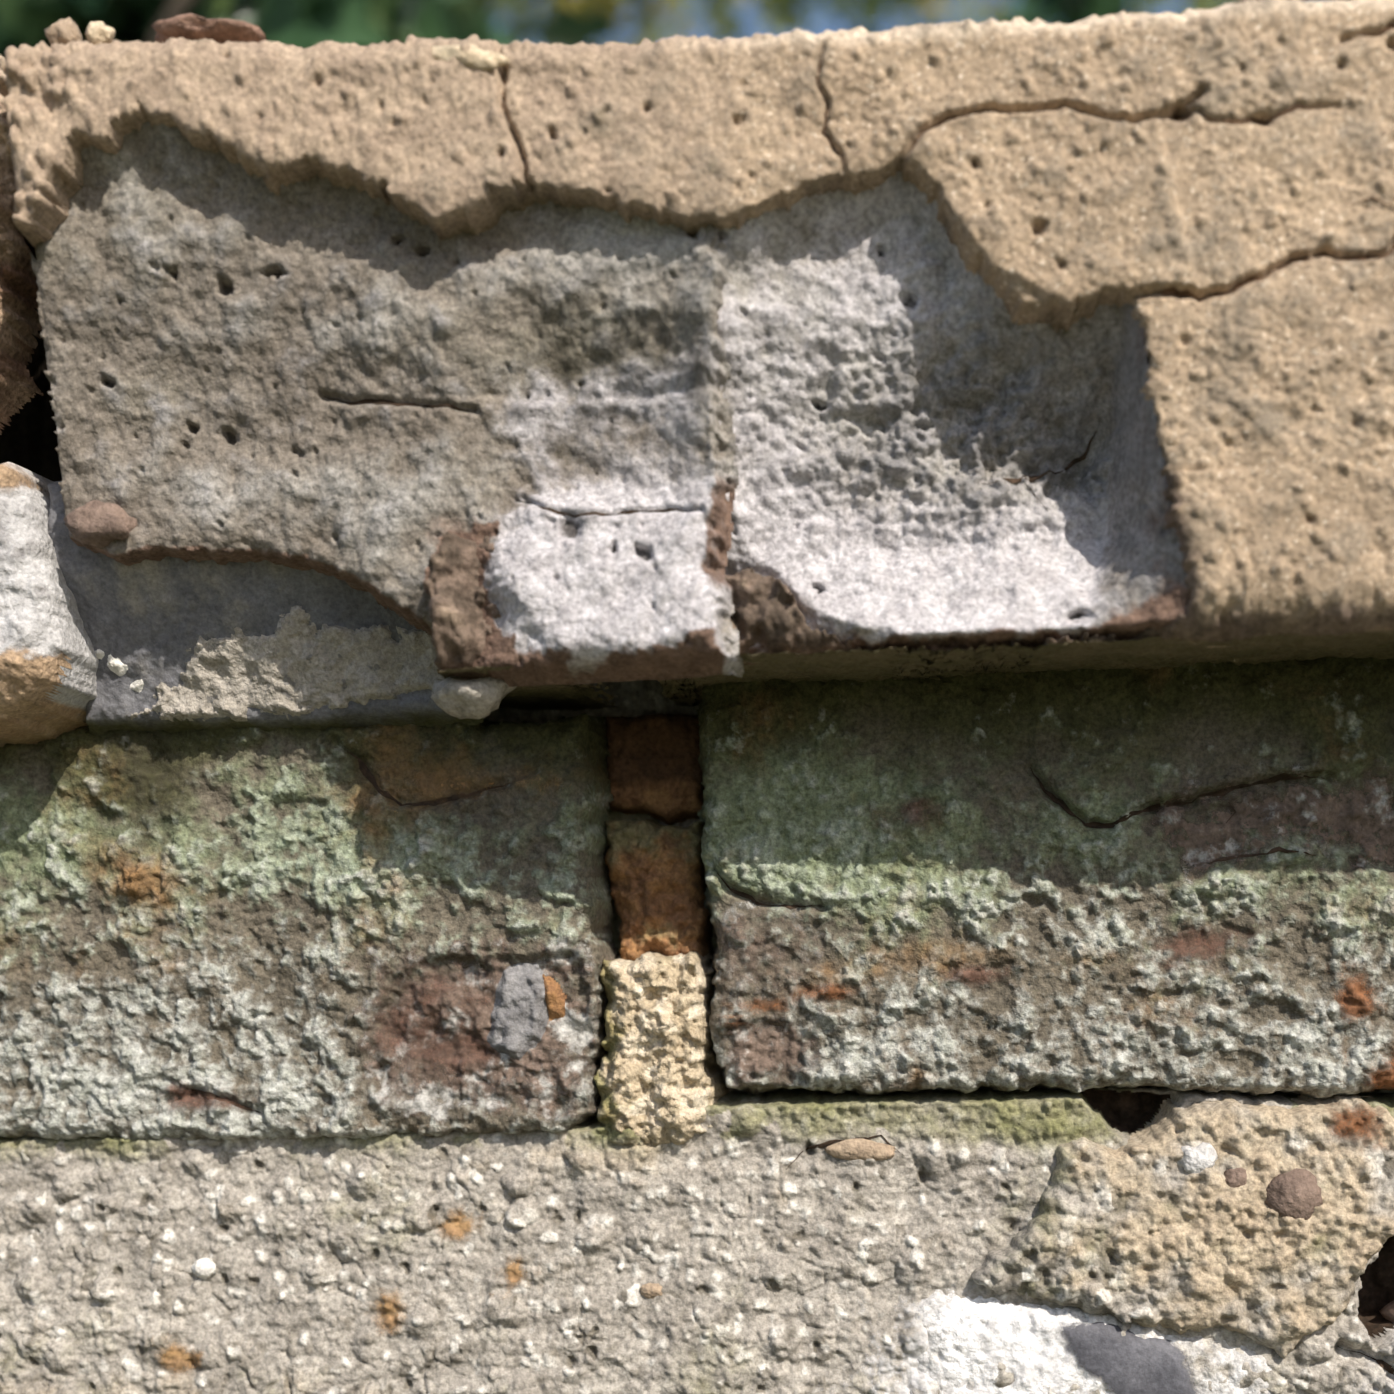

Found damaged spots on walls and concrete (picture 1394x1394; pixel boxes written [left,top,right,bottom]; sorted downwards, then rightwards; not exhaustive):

spalling [431,44,510,71]
crack [1341,23,1394,41]
crack [903,96,1335,162]
crack [1133,243,1394,302]
spalling [0,55,1192,687]
crack [325,397,476,412]
peeling [0,648,72,720]
crack [1030,767,1325,865]